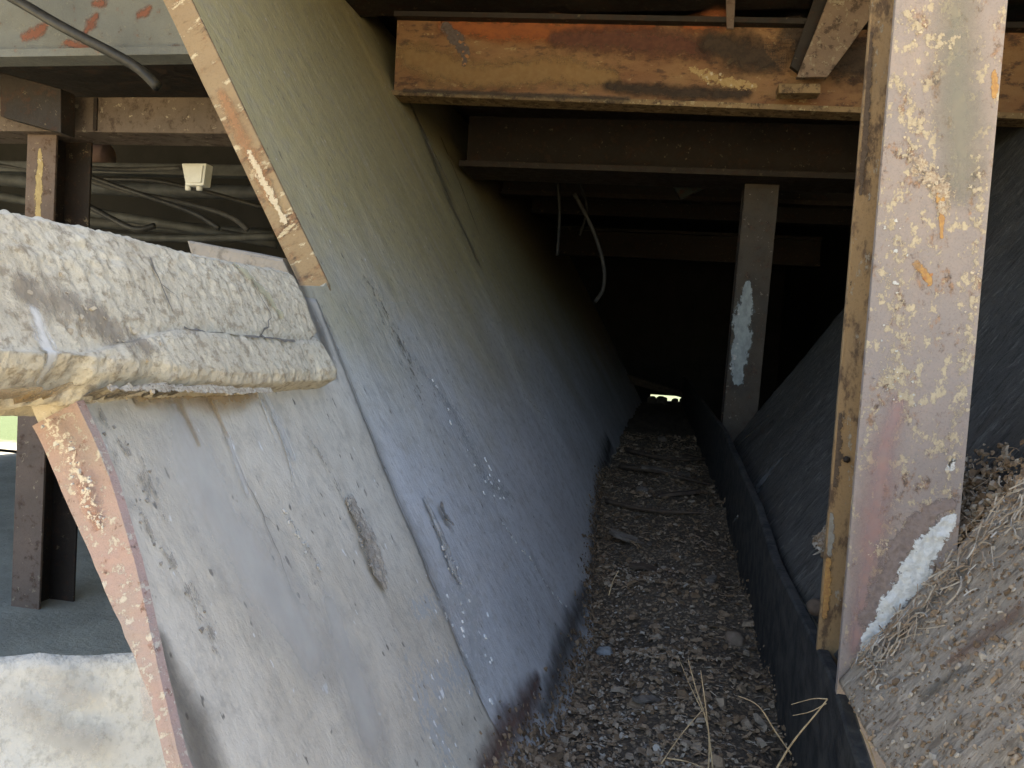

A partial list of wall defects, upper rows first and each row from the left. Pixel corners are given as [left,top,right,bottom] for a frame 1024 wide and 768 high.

corrosion [20,23,48,41]
corrosion [63,0,105,48]
corrosion [438,12,725,60]
corrosion [991,70,999,98]
corrosion [936,193,945,239]
crack [150,257,295,342]
corrosion [912,260,933,286]
peeling [730,281,754,386]
peeling [33,405,106,535]
spalling [83,382,273,572]
spalling [308,436,387,589]
corrosion [822,557,832,620]